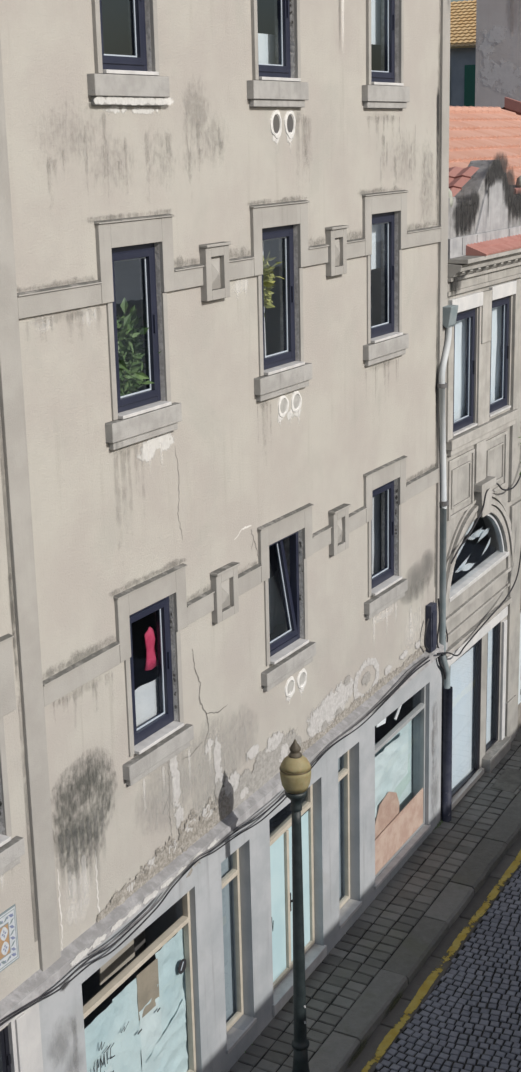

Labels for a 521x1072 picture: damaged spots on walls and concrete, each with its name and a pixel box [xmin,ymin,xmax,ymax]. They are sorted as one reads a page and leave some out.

mould [453,154,521,236]
peeling [136,432,174,462]
crack [163,649,228,834]
damp [55,759,112,857]
spalling [70,641,426,966]